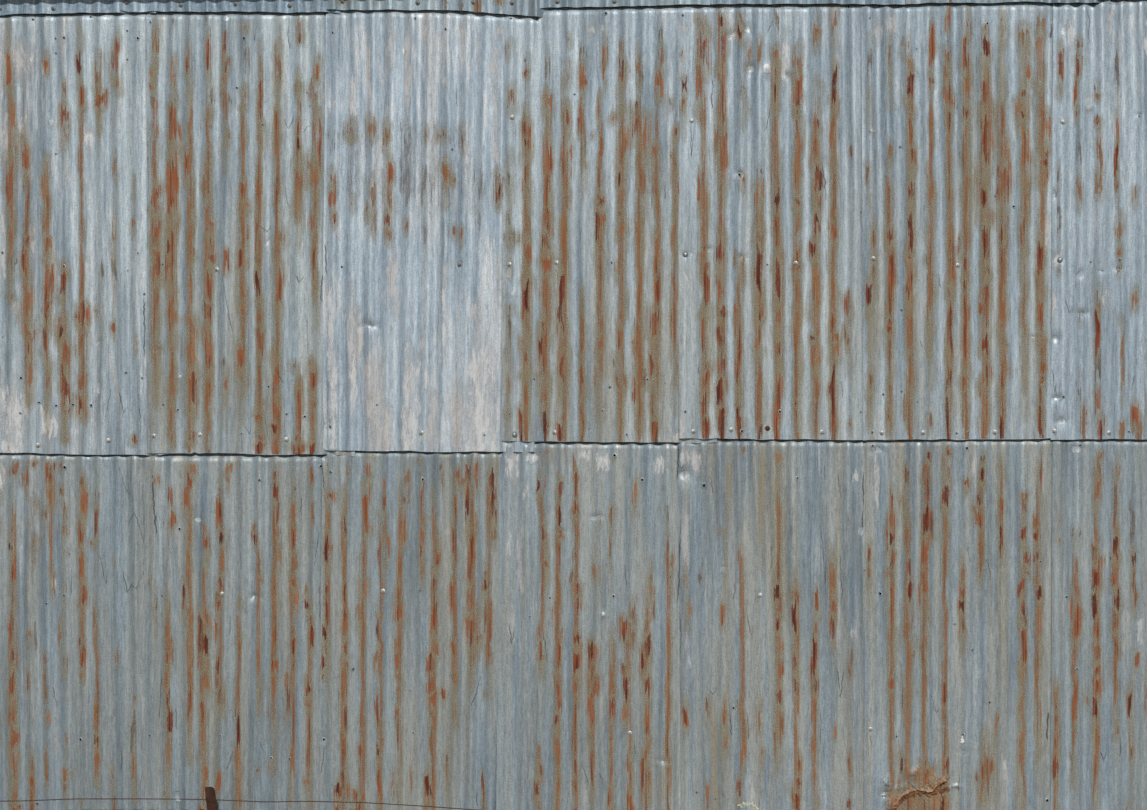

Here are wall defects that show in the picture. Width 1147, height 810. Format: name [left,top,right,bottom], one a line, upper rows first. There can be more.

corrosion [8,460,113,810]
corrosion [5,37,120,441]
corrosion [147,26,317,810]
corrosion [294,60,336,299]
corrosion [251,455,497,810]
corrosion [347,117,409,242]
corrosion [534,456,689,810]
corrosion [493,9,853,454]
corrosion [705,454,837,810]
corrosion [866,0,1083,810]
corrosion [1017,291,1147,810]
corrosion [1076,114,1119,204]